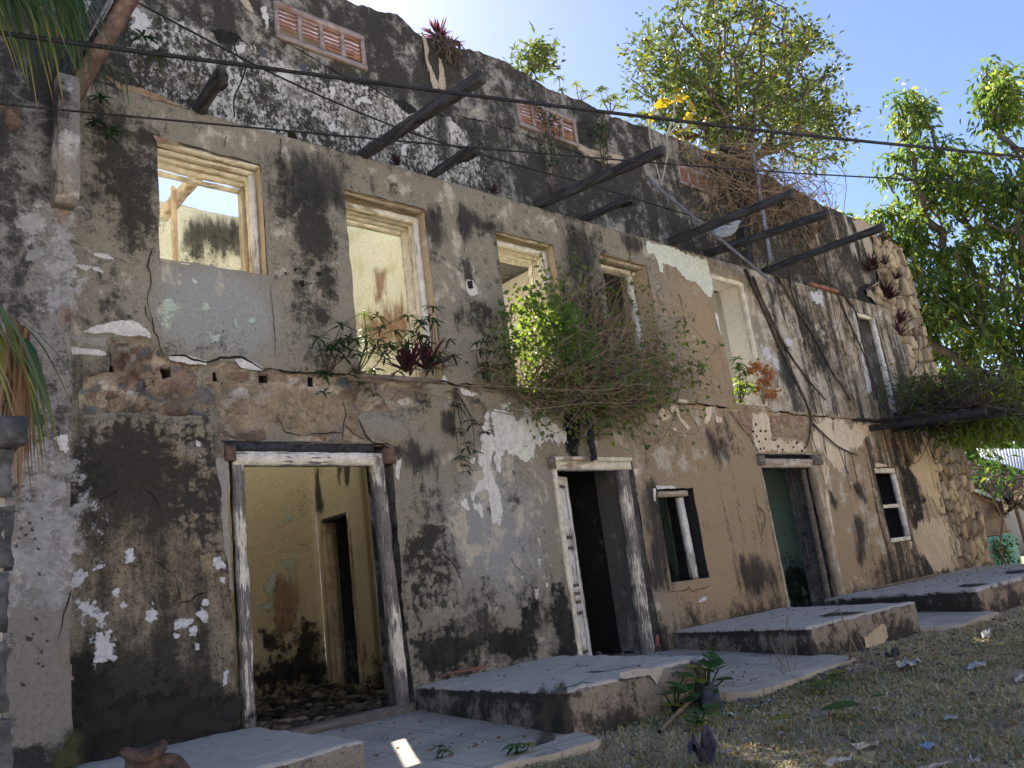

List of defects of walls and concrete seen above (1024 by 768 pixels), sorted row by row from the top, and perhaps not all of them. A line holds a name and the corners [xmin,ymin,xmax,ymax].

leakage [426,206,443,245]
leakage [457,205,503,239]
peeling [646,241,713,298]
flaking render [71,297,425,446]
crack [114,247,392,446]
peeling [460,403,568,526]
peeling [704,406,870,535]
leakage [891,436,926,528]
leakage [124,548,136,564]
leakage [210,554,226,584]
leakage [51,560,255,768]
leakage [402,582,581,682]